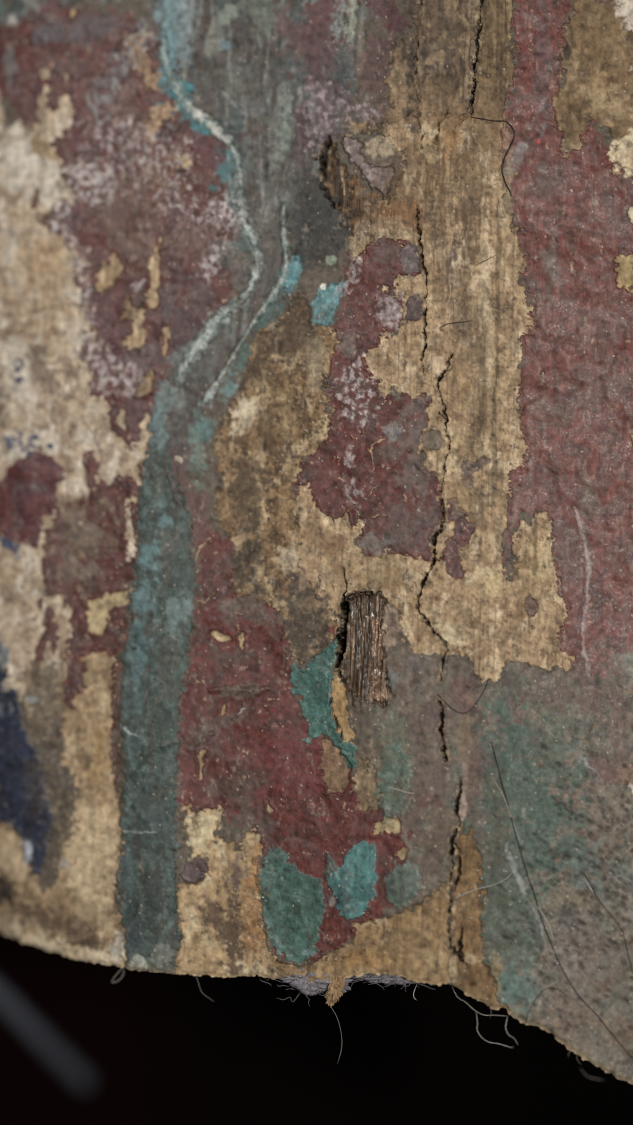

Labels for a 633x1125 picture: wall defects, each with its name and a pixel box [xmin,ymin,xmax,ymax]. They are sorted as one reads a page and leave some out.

peeling [134,50,180,132]
crack [412,0,487,149]
peeling [552,0,633,184]
peeling [0,67,154,967]
peeling [121,236,162,350]
peeling [161,326,171,357]
peeling [211,0,575,860]
crack [387,197,469,970]
peeling [614,254,633,293]
peeling [174,802,512,1013]